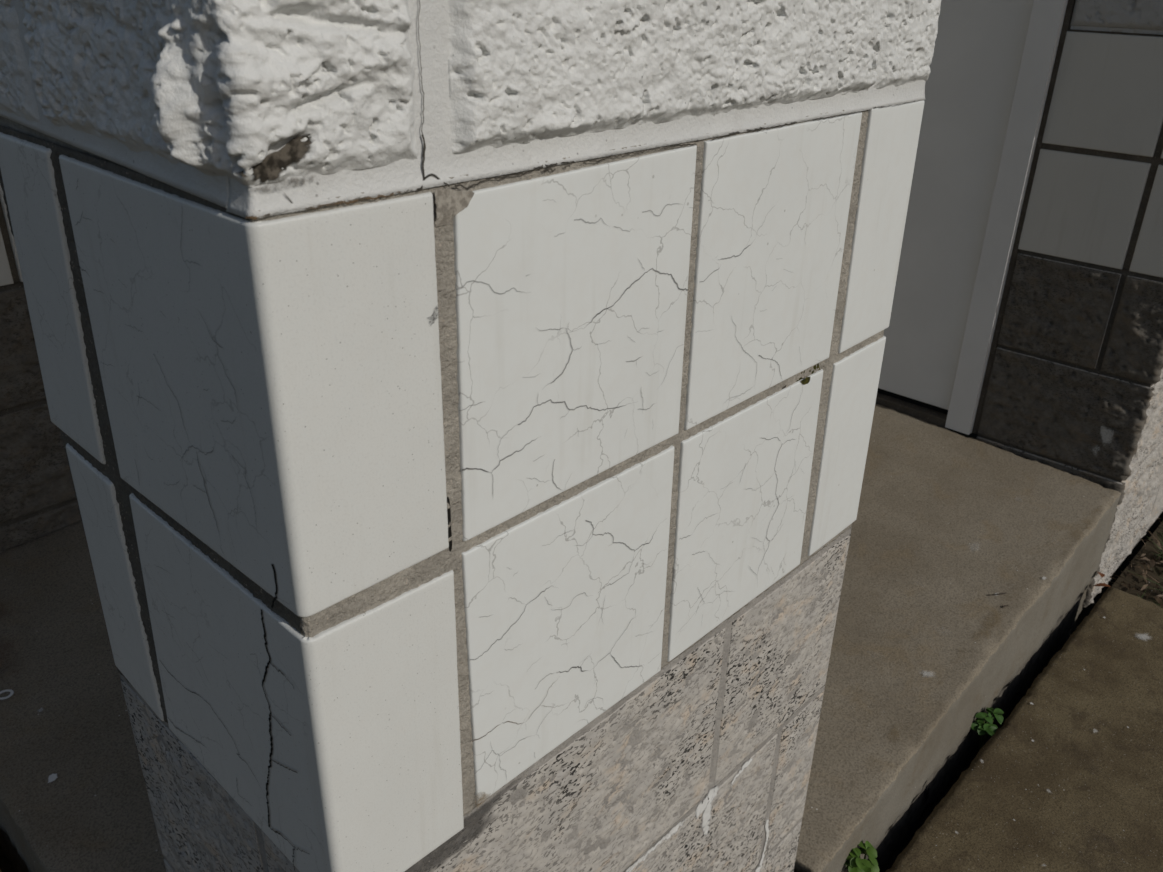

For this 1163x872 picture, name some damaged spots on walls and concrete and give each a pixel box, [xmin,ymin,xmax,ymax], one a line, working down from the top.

crack [245,0,918,220]
crack [462,336,643,472]
crack [592,268,689,320]
crack [163,564,309,870]